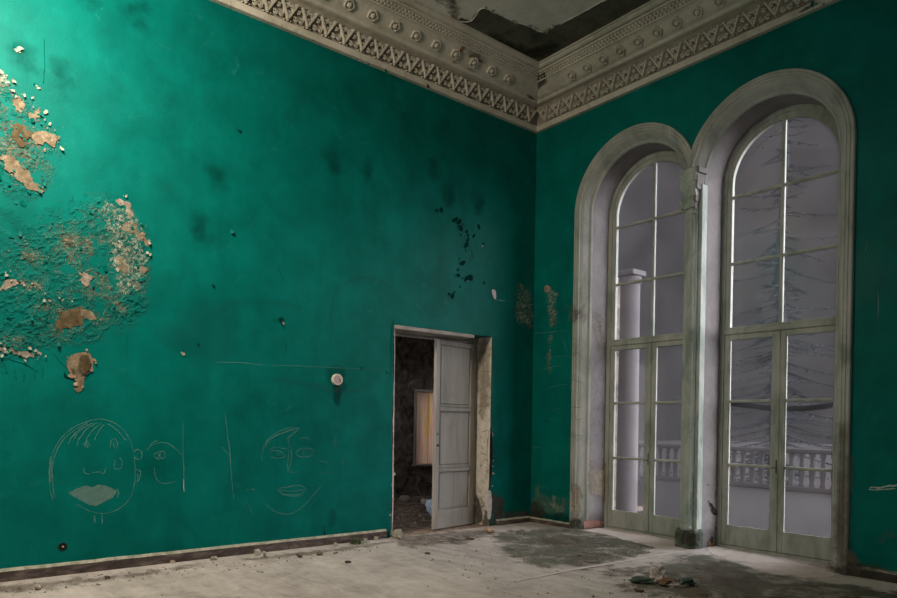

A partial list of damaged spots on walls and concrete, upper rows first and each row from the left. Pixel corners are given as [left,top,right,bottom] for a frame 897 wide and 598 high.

peeling [0,69,153,393]
peeling [444,217,502,301]